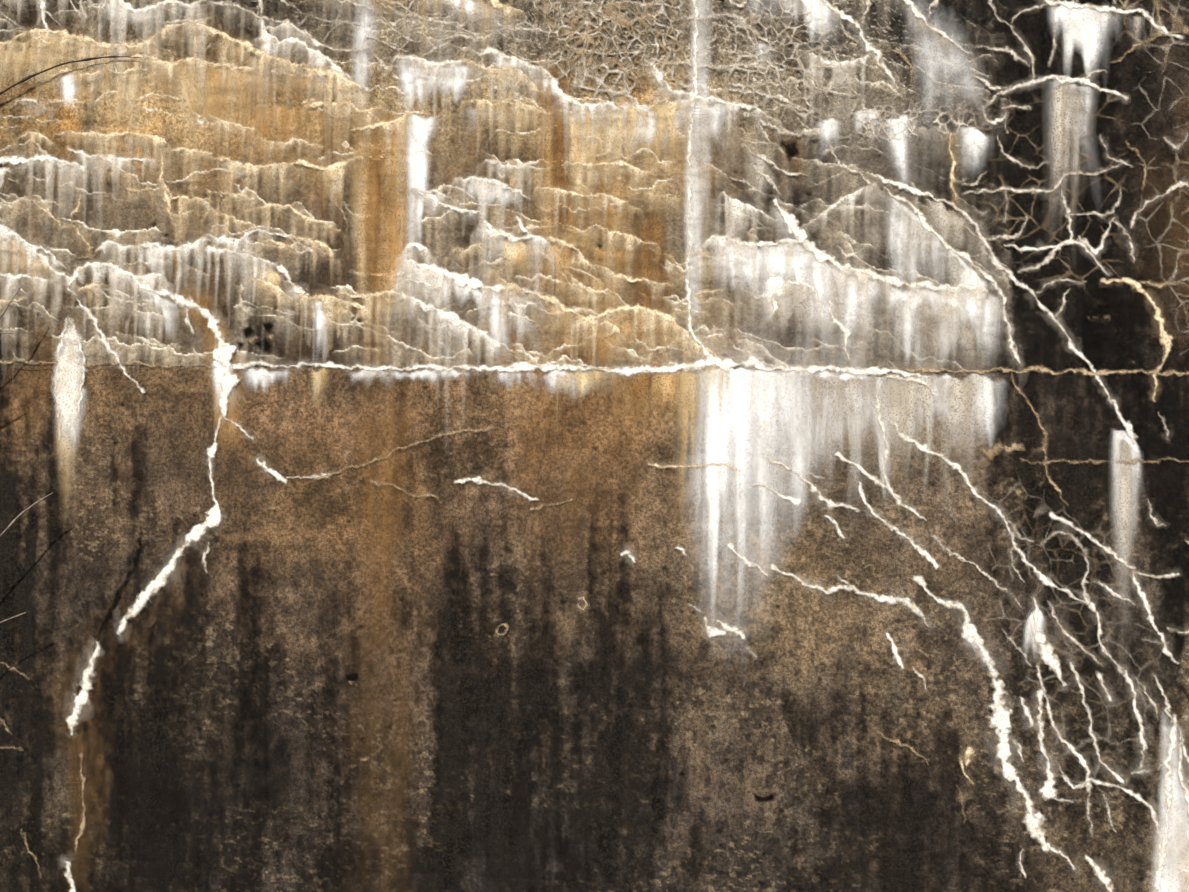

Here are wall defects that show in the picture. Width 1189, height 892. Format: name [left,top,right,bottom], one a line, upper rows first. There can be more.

crack [0,288,213,393]
efflorescence [0,0,432,225]
crack [0,0,683,95]
rust [357,119,412,351]
rust [544,86,680,228]
rust [588,213,674,355]
water stain [98,0,1189,730]
crack [648,0,1189,876]
crack [25,419,573,892]
water stain [1037,690,1056,798]
water stain [1154,684,1189,892]
spalling [1176,650,1189,702]